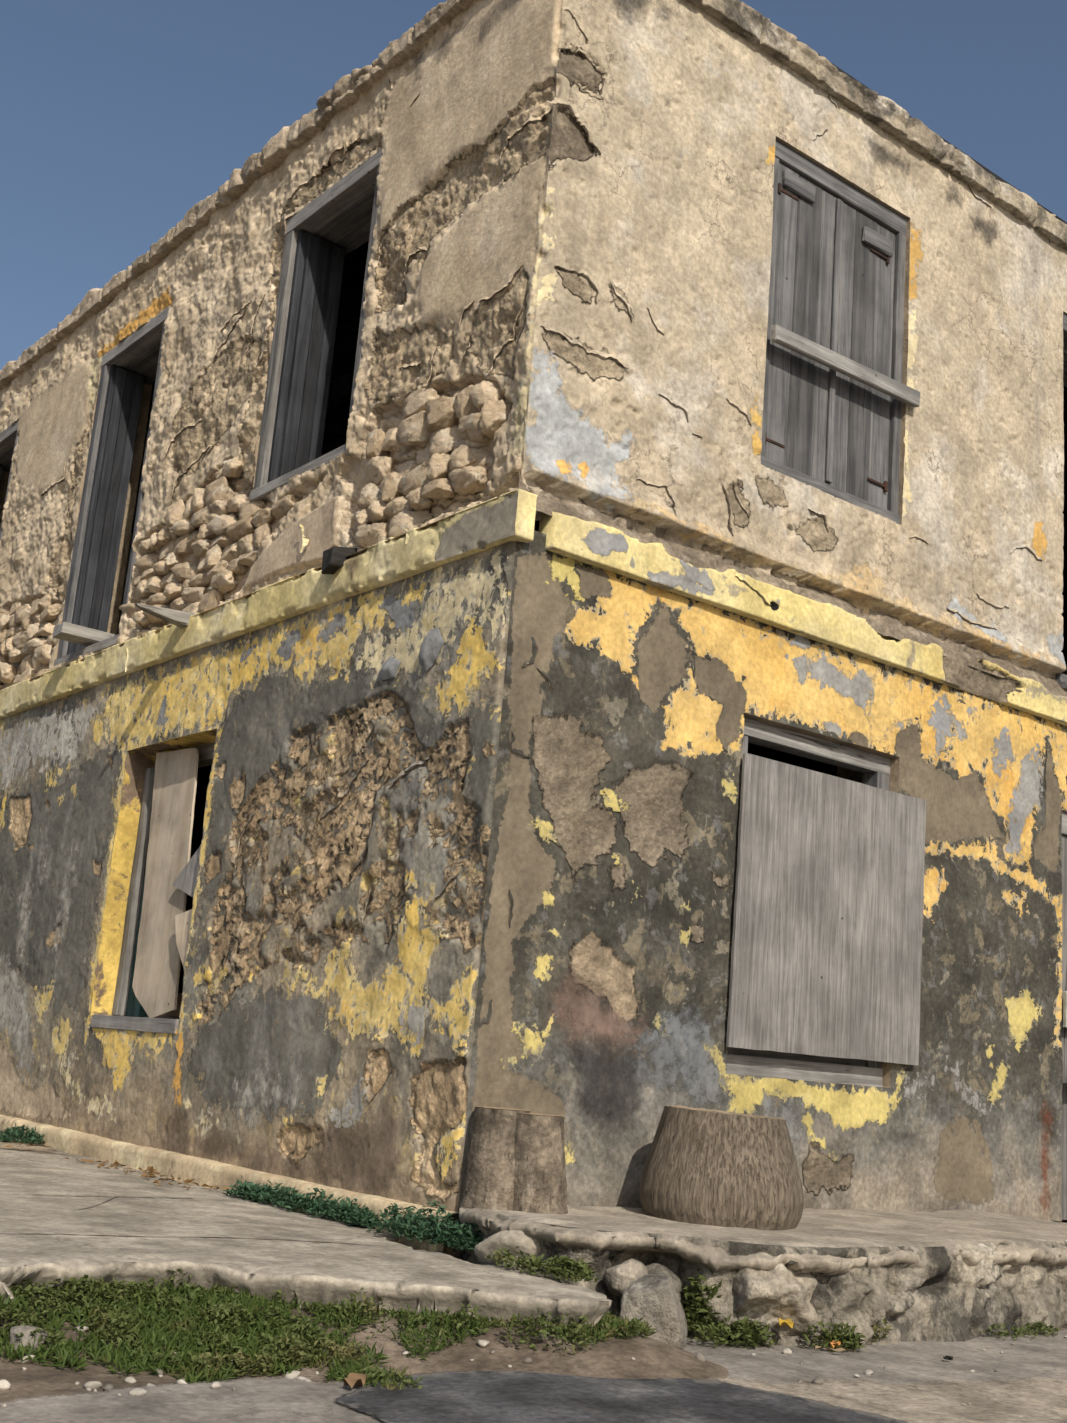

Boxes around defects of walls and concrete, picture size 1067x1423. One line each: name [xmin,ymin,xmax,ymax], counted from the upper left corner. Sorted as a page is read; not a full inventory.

spalling [374,43,603,313]
crack [214,294,265,362]
crack [165,419,218,502]